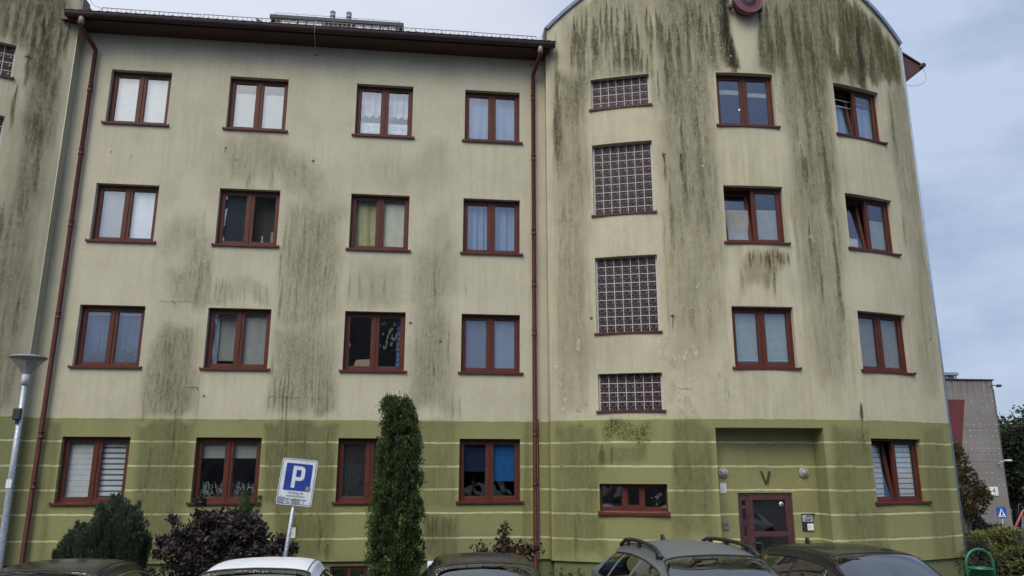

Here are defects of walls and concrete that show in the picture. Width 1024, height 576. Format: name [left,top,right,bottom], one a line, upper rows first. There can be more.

damp [1,0,70,160]
damp [571,0,739,134]
damp [759,0,900,216]